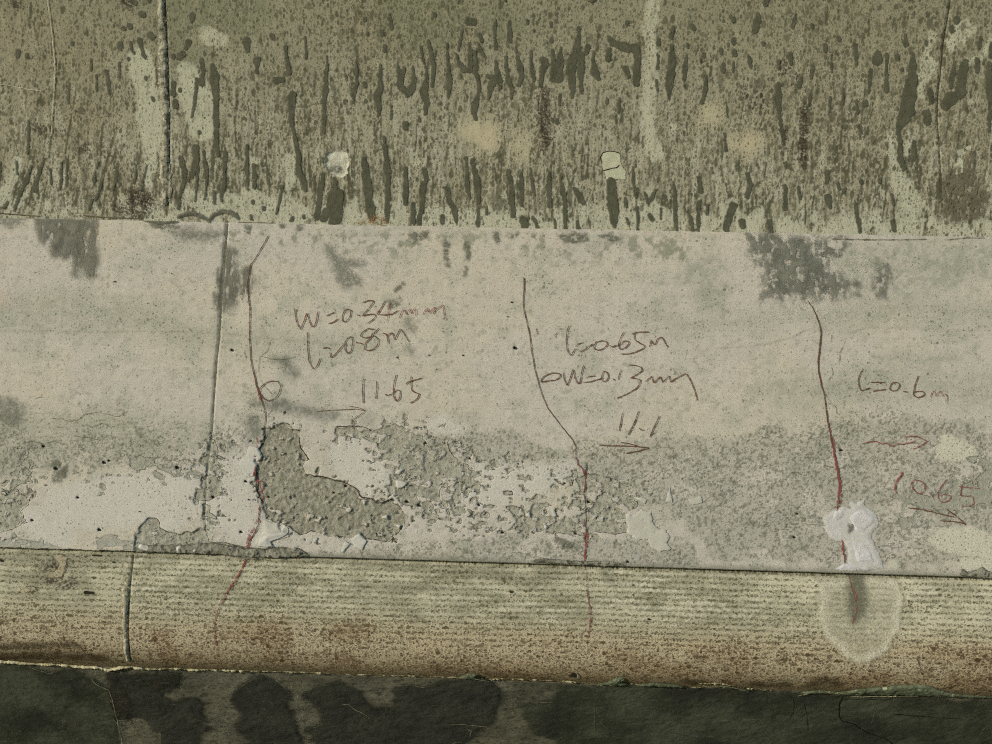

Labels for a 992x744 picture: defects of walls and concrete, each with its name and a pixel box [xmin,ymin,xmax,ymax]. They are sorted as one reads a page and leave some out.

damp [35,161,118,277]
damp [177,58,227,210]
damp [242,33,344,233]
damp [361,135,428,241]
damp [343,13,641,148]
damp [494,166,709,243]
damp [655,25,708,105]
damp [722,169,858,300]
damp [828,33,992,172]
crack [244,335,385,544]
spalling [85,411,671,556]
damp [812,499,903,663]